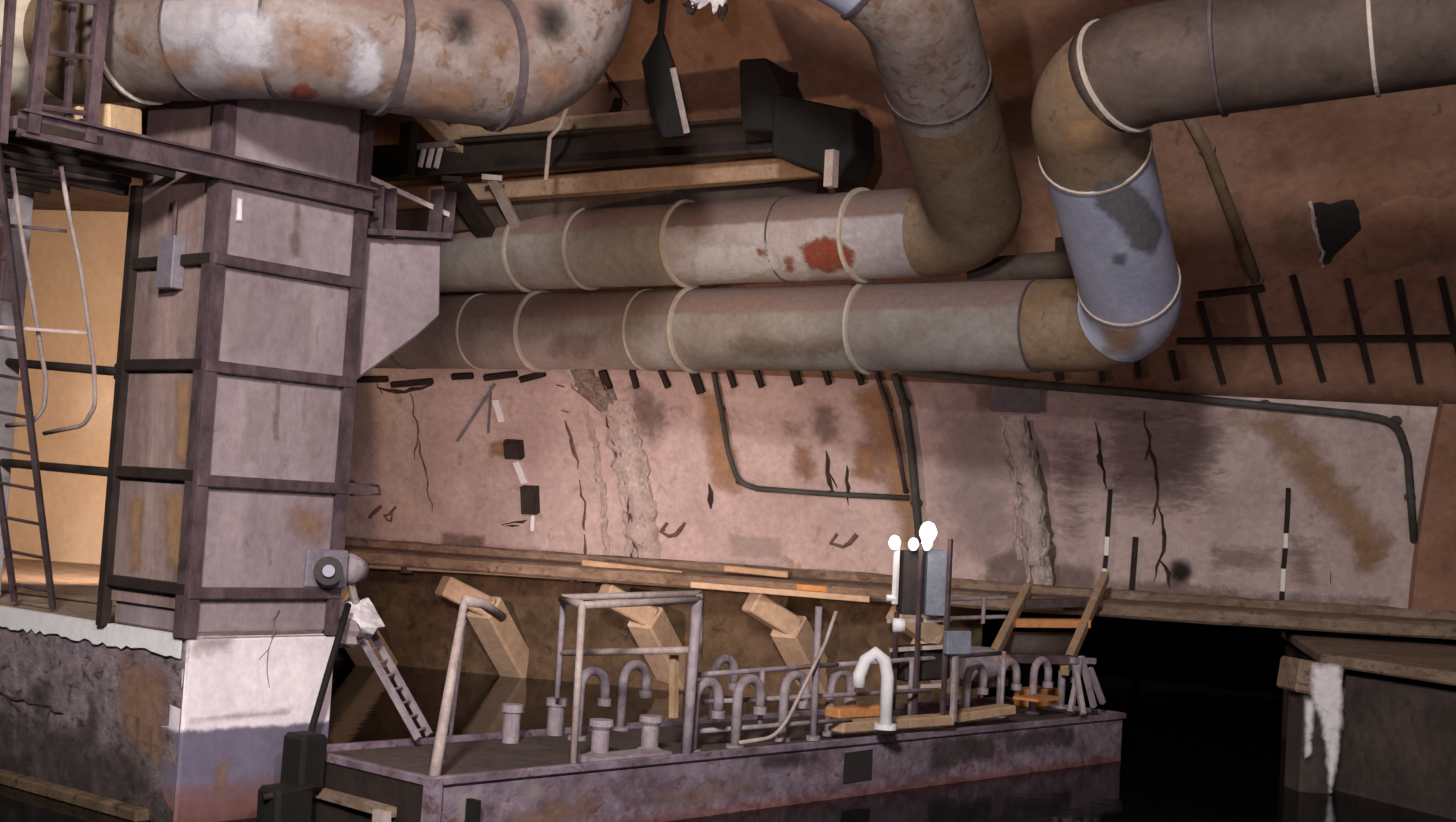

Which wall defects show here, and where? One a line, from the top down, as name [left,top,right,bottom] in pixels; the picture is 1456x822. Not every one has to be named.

spalling [1308,199,1361,268]
crack [376,383,433,511]
crack [557,385,587,554]
crack [1095,422,1107,488]
crack [1143,411,1171,590]
crack [0,691,63,713]